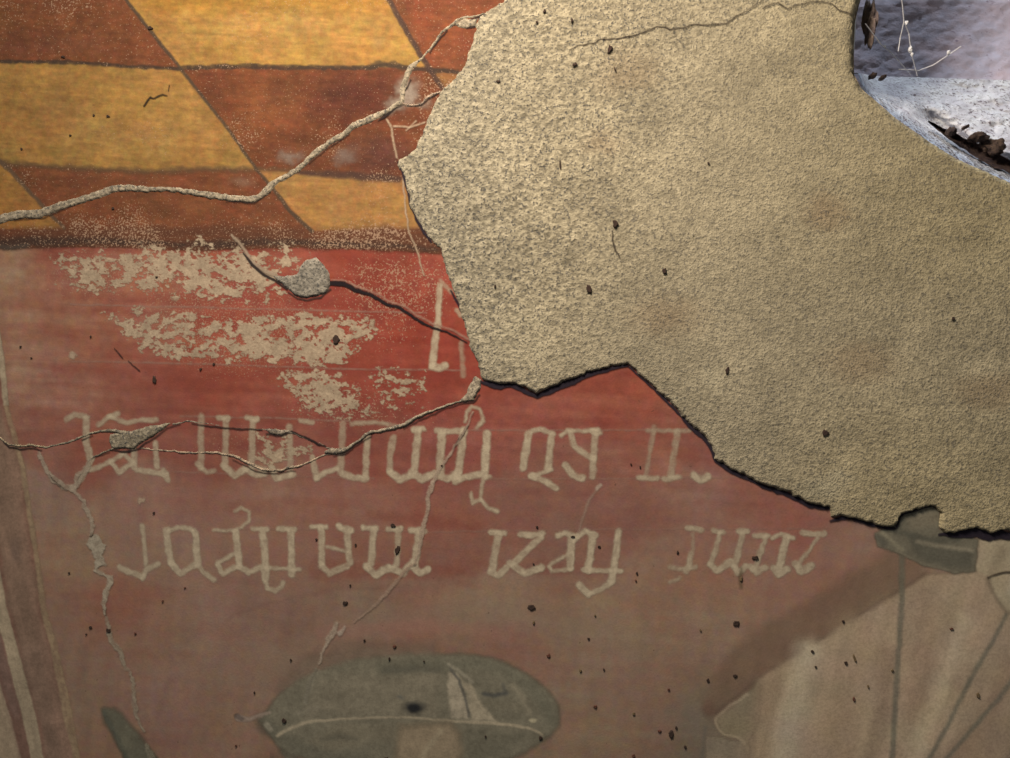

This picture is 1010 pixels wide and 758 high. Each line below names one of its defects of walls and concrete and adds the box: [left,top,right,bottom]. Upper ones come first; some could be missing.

peeling [50,235,427,421]
crack [0,13,485,275]
crack [231,234,469,343]
peeling [398,0,1010,533]
crack [0,364,937,758]
crack [938,527,1010,541]